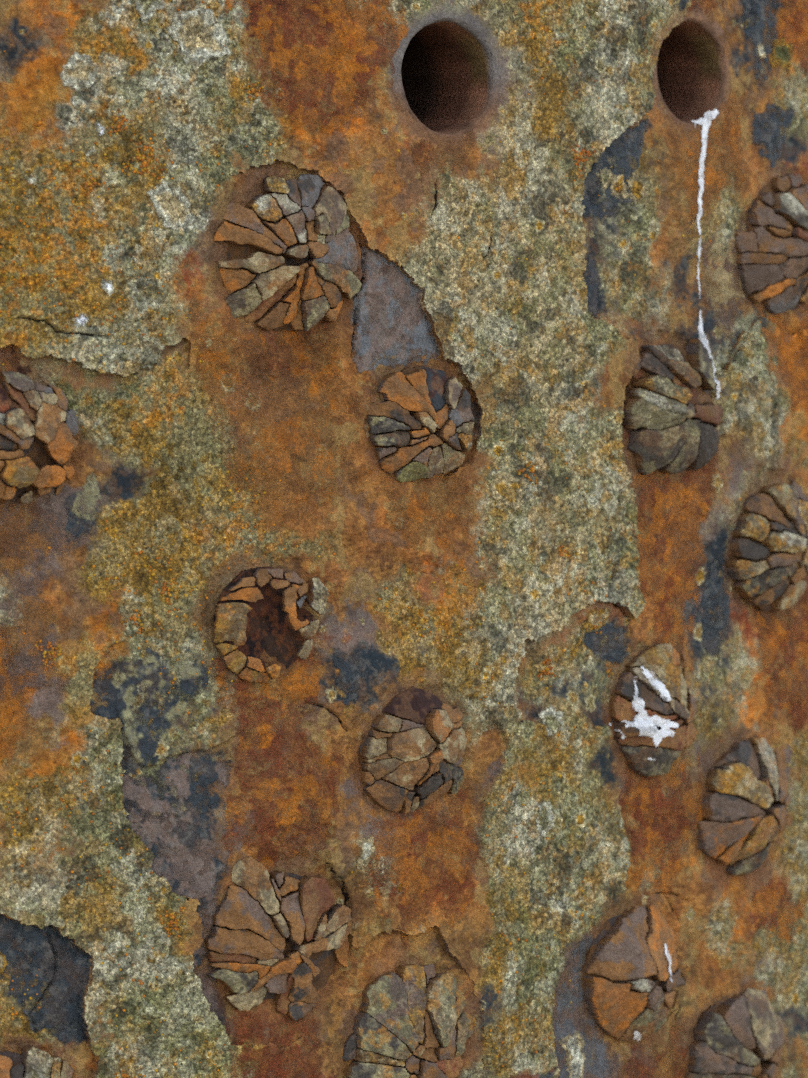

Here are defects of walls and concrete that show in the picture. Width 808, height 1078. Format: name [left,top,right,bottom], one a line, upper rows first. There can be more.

spalling [582,118,648,220]
spalling [351,247,440,373]
spalling [583,260,603,318]
water stain [701,233,749,334]
corrosion [367,368,475,483]
spalling [584,620,630,664]
corrosion [609,338,793,893]
corrosion [204,568,352,1078]
corrosion [358,686,478,946]
spalling [0,914,92,1043]
corrosion [342,964,475,1078]
corrosion [583,904,686,1042]